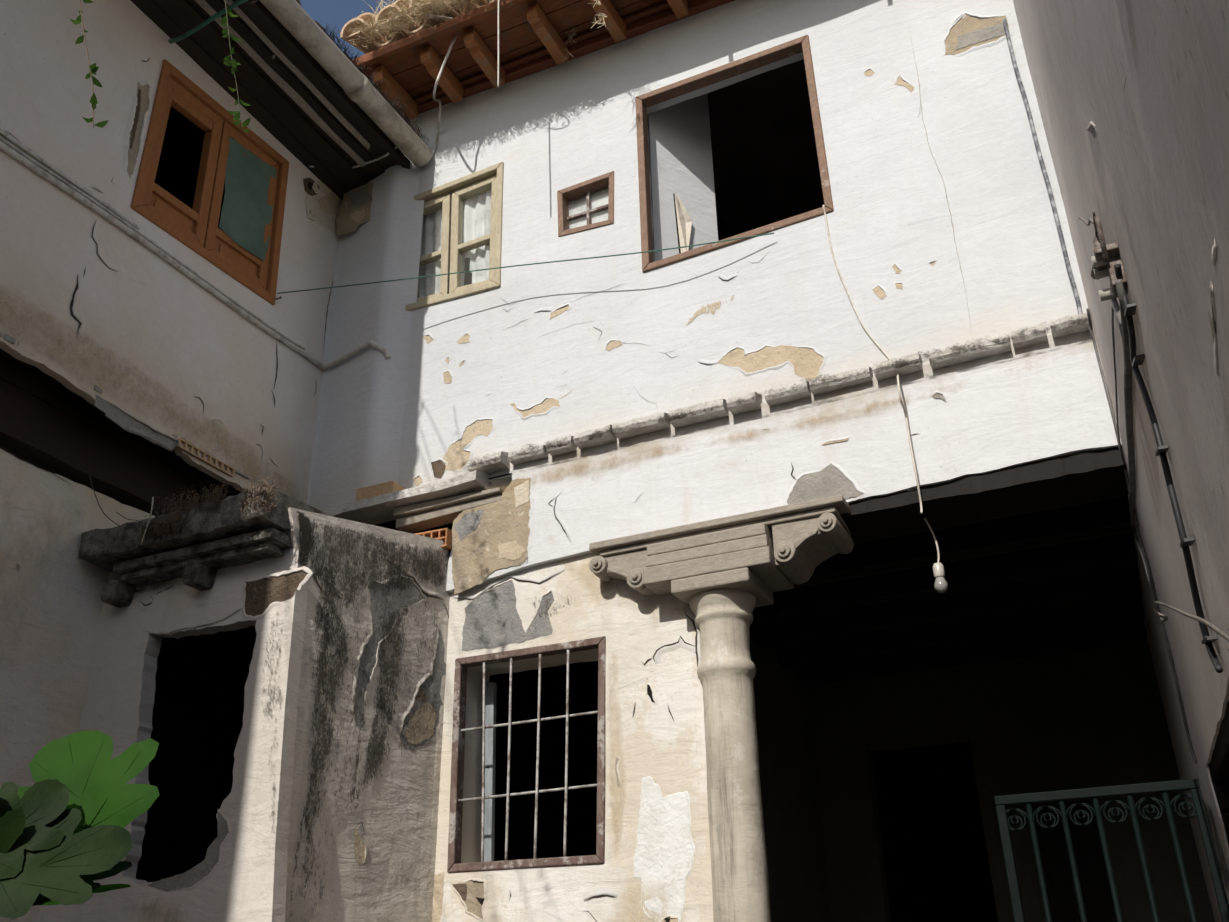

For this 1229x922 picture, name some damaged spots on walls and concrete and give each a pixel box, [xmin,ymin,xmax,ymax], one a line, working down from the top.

crack [946,13,966,29]
spalling [941,12,1013,57]
crack [58,220,119,342]
peeling [717,344,827,381]
peeling [412,418,495,486]
peeling [785,461,867,505]
peeling [146,566,313,636]
crack [313,570,343,600]
spalling [375,473,558,651]
crack [371,491,576,618]
crack [641,605,700,668]
damp [291,519,449,912]